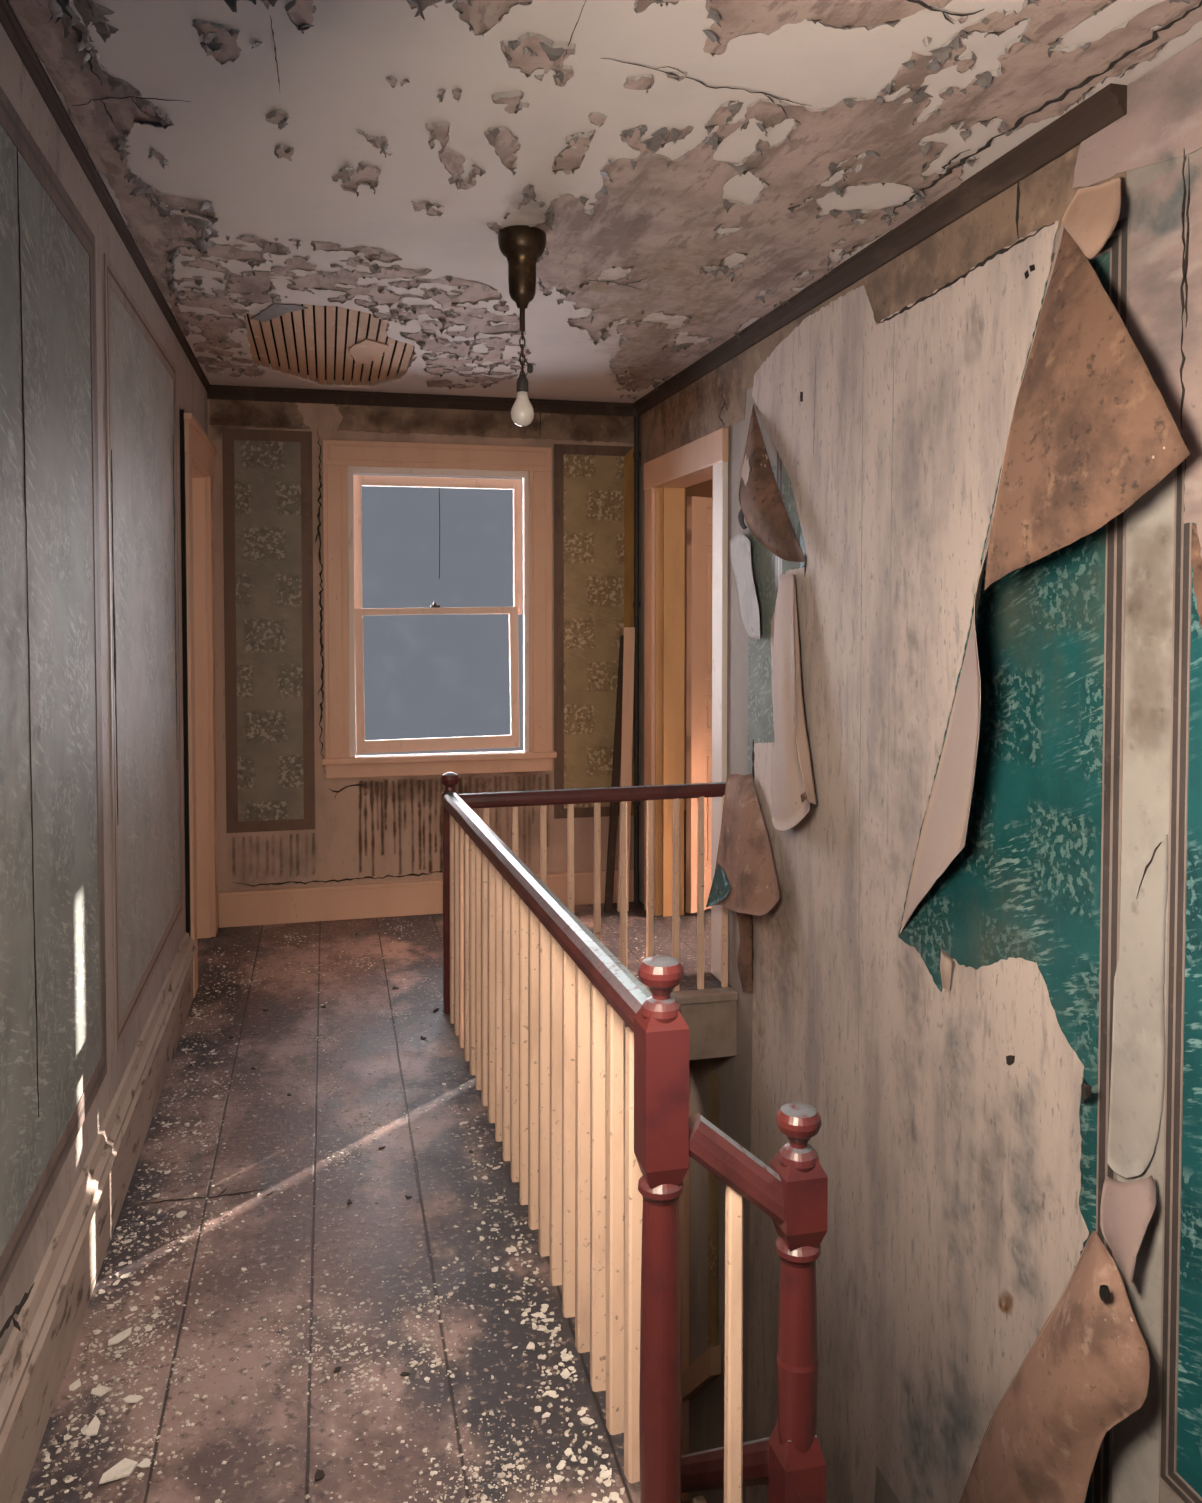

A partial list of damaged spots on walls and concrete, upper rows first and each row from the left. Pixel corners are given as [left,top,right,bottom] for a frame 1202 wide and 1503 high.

crack [55,0,190,127]
peeling [8,0,536,390]
peeling [406,0,1202,400]
crack [1180,149,1190,430]
damp [359,778,486,876]